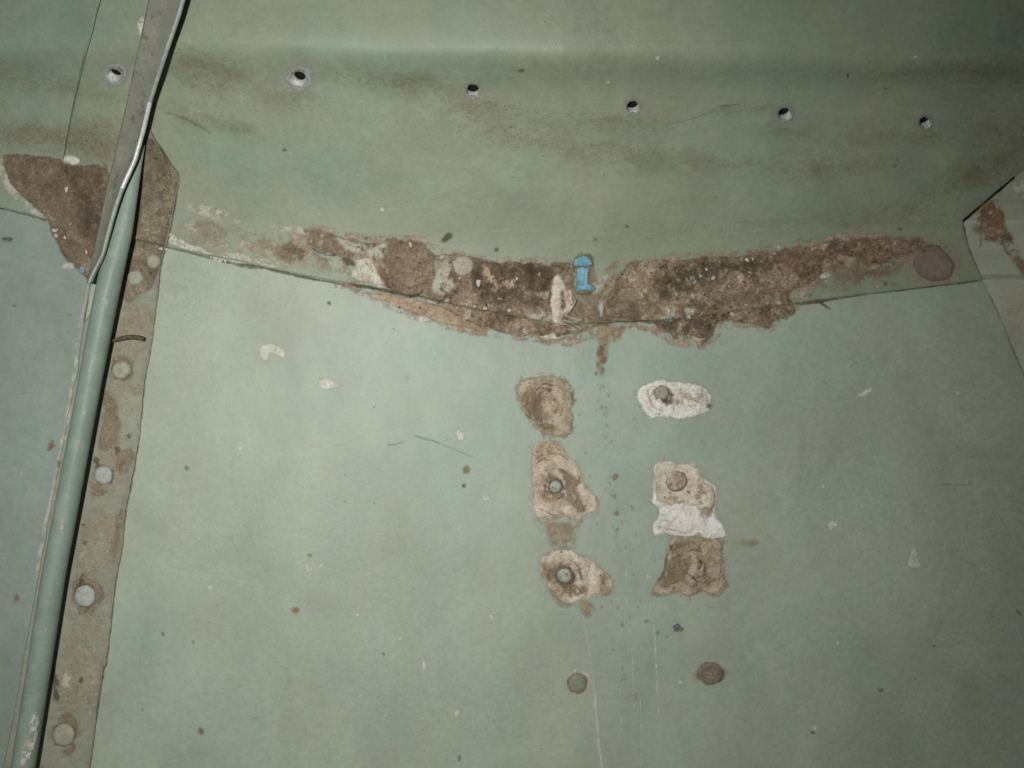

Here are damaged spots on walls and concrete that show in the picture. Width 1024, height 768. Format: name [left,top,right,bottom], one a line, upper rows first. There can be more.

peeling [158,205,590,346]
corrosion [274,230,957,374]
peeling [567,233,922,348]
corrosion [975,202,1024,273]